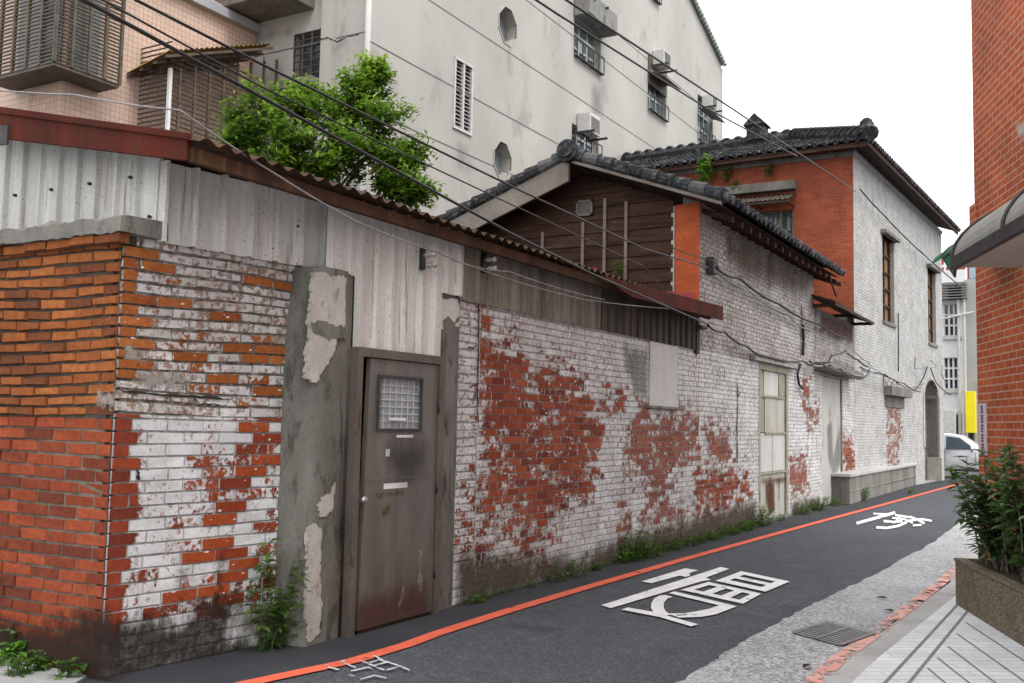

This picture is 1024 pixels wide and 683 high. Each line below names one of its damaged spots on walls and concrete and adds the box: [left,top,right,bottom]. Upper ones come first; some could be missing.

flaking render [302,272,348,383]
crack [120,390,233,406]
peeling [105,245,292,630]
peeling [441,298,755,566]
peeling [788,373,820,507]
peeling [885,407,903,466]
flaking render [316,482,336,517]
water stain [459,503,756,599]